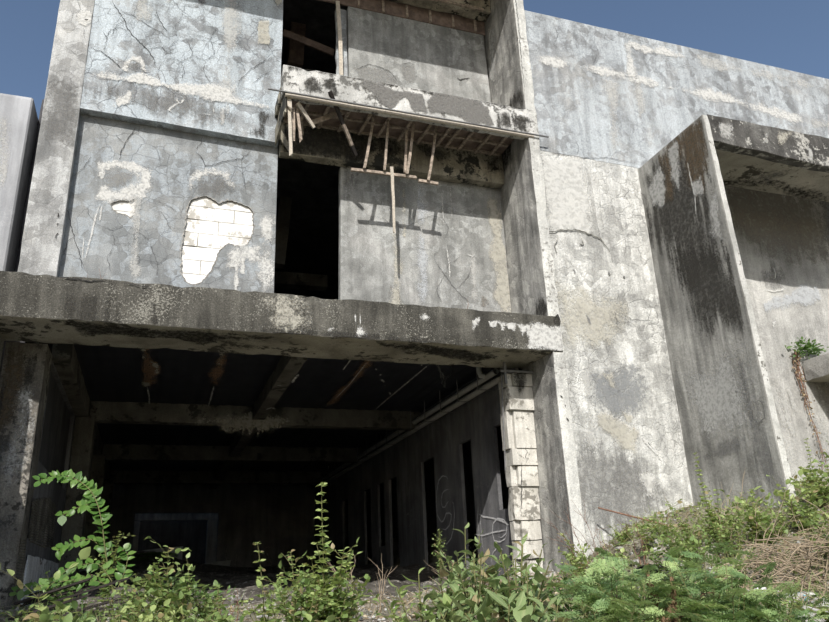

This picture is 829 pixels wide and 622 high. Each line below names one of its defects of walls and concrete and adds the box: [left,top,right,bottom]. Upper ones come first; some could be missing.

crack [65,0,274,83]
peeling [353,80,494,125]
crack [58,184,180,288]
peeling [109,198,136,219]
peeling [179,195,256,286]
water stain [646,155,744,334]
peeling [472,314,563,351]